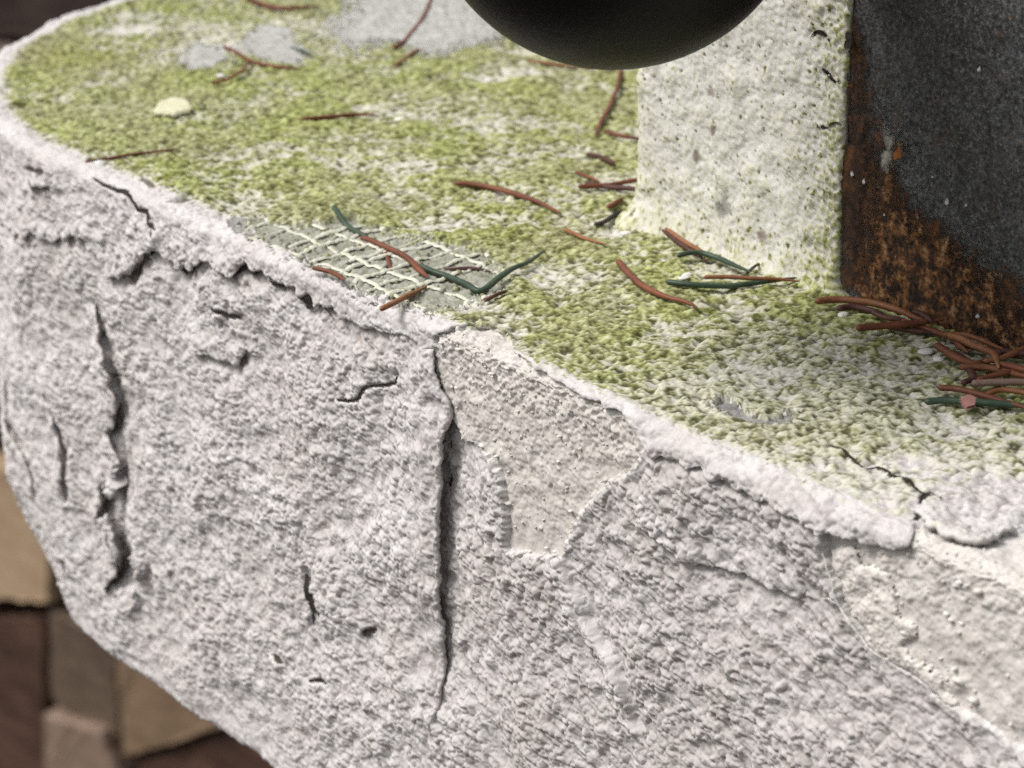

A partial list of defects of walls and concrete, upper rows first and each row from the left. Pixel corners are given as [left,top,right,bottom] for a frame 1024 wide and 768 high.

crack [93,178,155,260]
corrosion [840,14,1024,349]
crack [336,376,398,403]
spalling [0,206,1024,746]
crack [830,445,941,520]